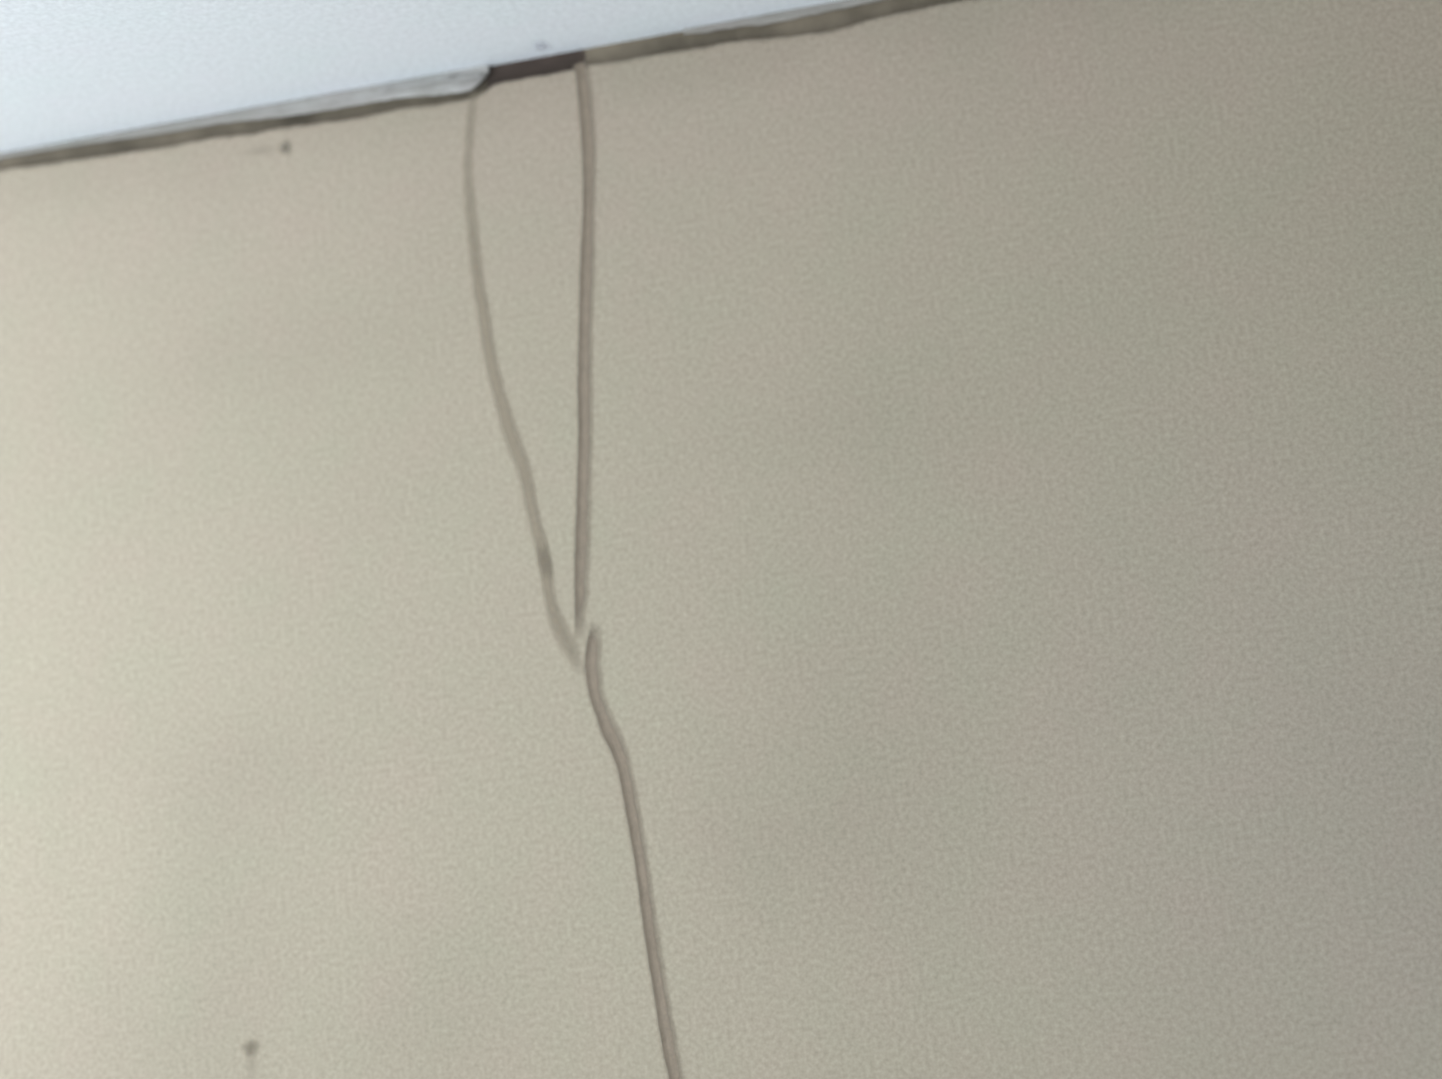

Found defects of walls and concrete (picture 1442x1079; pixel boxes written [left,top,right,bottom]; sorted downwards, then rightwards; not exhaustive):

crack [0,76,488,170]
crack [467,0,962,1079]